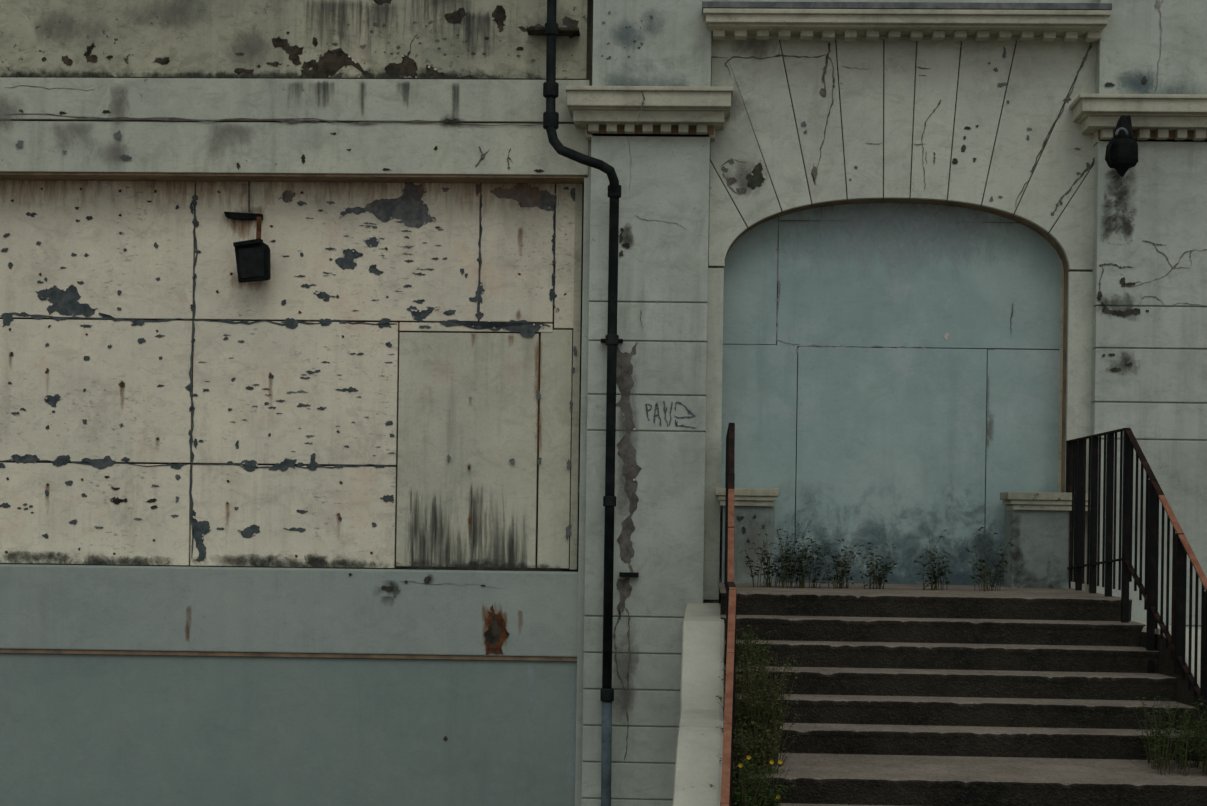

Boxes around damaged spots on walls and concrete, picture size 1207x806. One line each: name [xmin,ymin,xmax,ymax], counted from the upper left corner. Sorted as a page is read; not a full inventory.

spalling [234,22,386,79]
spalling [384,5,544,78]
leakage [1104,169,1132,235]
peeling [279,169,575,337]
crack [1099,241,1207,307]
peeling [0,194,397,562]
leakage [411,492,547,571]
spalling [613,342,642,760]
rust [484,604,509,654]